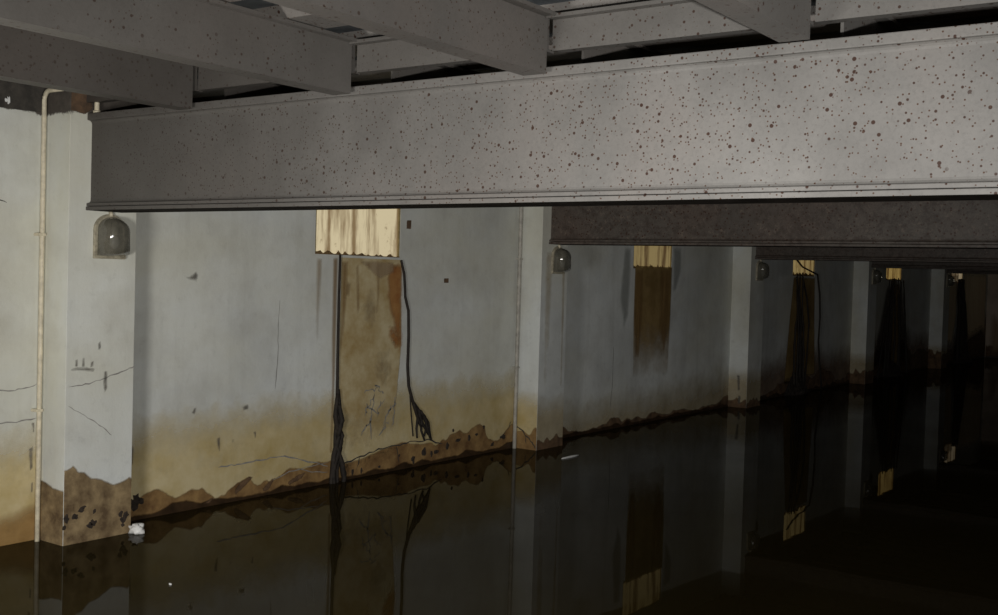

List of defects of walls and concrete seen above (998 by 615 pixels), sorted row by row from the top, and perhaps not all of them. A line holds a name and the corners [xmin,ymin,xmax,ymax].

crack [70,366,134,435]
water stain [0,366,790,546]
spalling [62,505,97,530]
spalling [118,493,144,527]